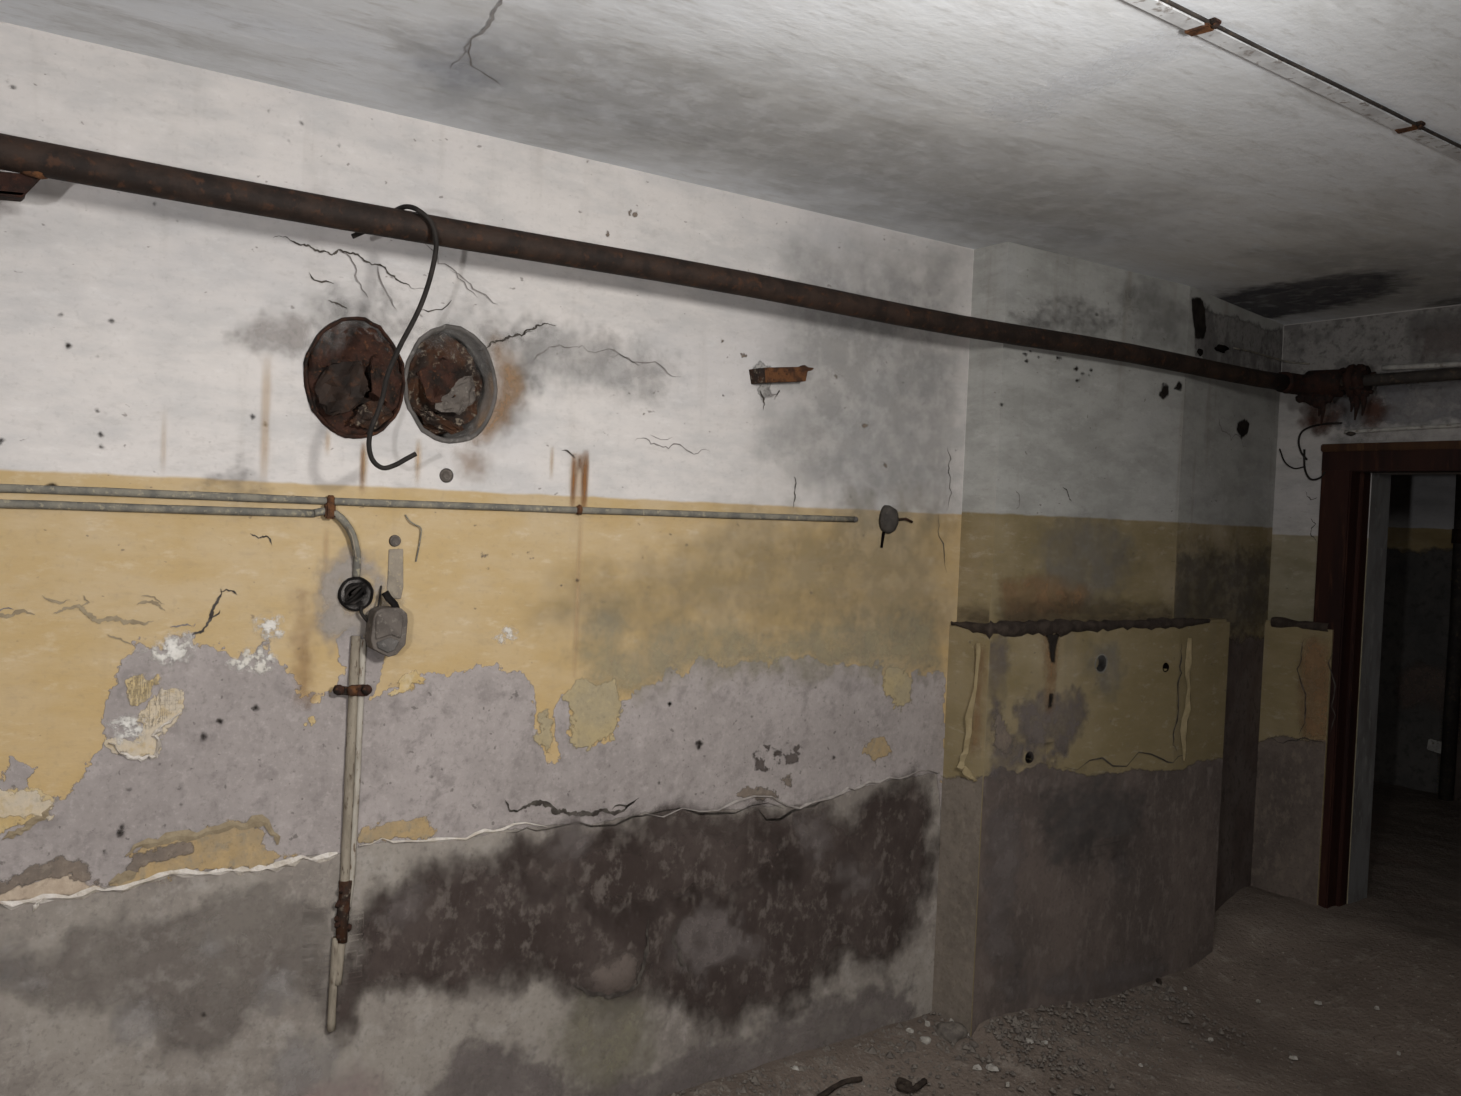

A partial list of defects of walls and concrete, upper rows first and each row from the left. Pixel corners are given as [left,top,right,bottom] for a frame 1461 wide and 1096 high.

crack [450,0,502,86]
crack [273,236,676,377]
corrosion [565,450,588,504]
crack [0,589,237,644]
damp [112,717,143,744]
peeling [0,624,946,1096]
crack [505,799,637,817]
peeling [971,636,1326,1037]
damp [0,776,983,1096]